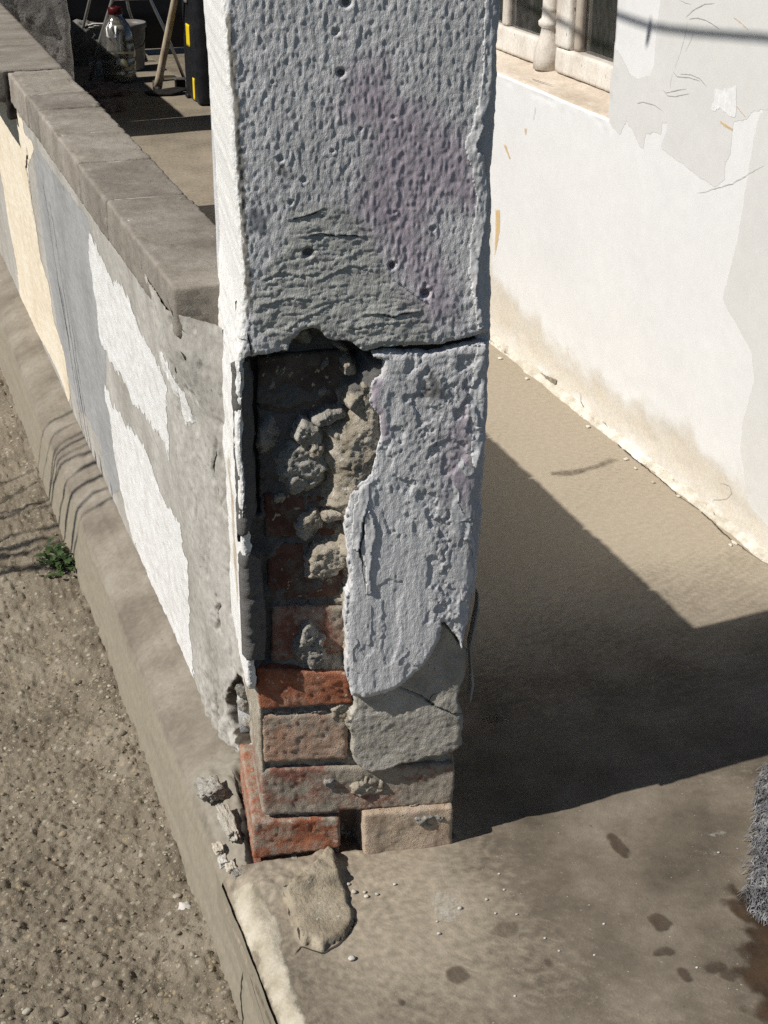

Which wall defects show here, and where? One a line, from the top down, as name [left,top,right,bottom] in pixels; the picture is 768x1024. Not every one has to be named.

spalling [231,328,382,671]
peeling [457,344,487,476]
crack [352,332,768,563]
water stain [490,271,768,546]
peeling [608,0,768,527]
flaking render [225,485,479,1024]